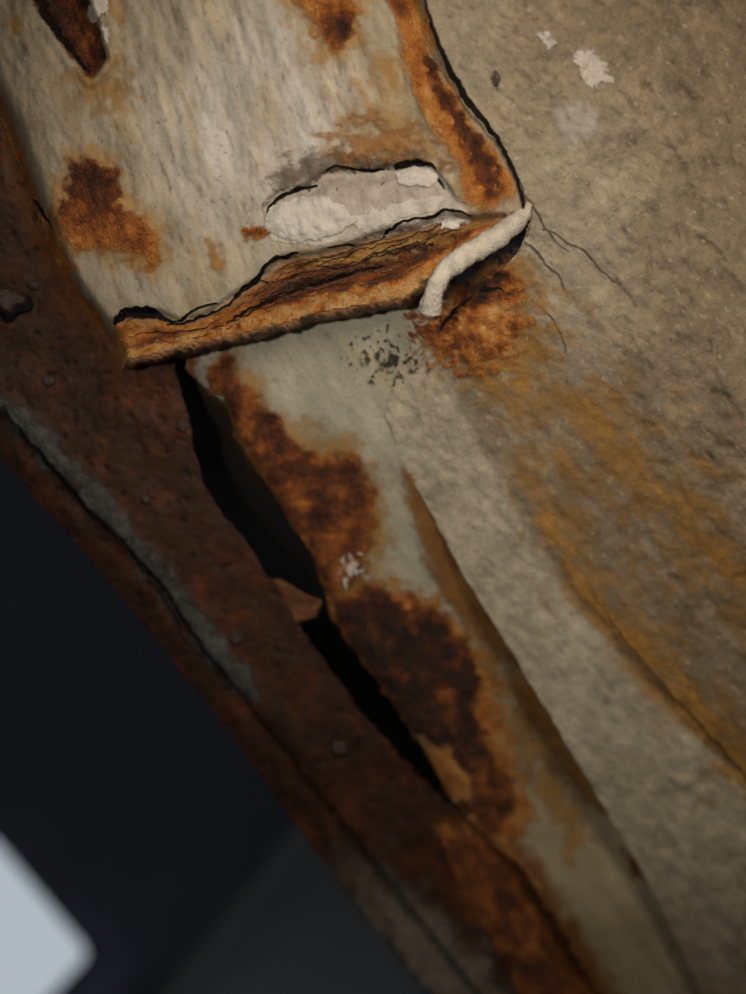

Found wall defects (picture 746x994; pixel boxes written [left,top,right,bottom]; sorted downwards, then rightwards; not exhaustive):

spalling [33,0,125,113]
rust [0,0,562,396]
spalling [262,145,471,246]
crack [424,0,621,291]
crack [531,299,566,351]
crack [3,406,250,705]
rust [206,351,605,892]
rust [621,848,641,878]